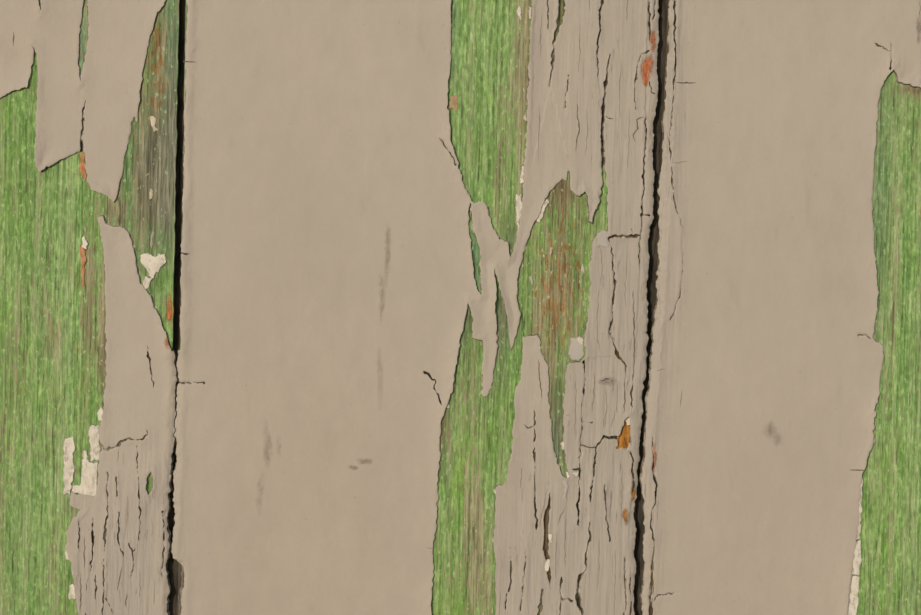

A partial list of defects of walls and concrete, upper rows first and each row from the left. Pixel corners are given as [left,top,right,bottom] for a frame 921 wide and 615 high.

peeling [0,0,188,615]
crack [78,431,165,615]
peeling [431,0,609,615]
crack [499,0,672,615]
corrosion [643,32,655,85]
crack [626,0,695,84]
crack [669,147,688,213]
peeling [847,71,921,615]